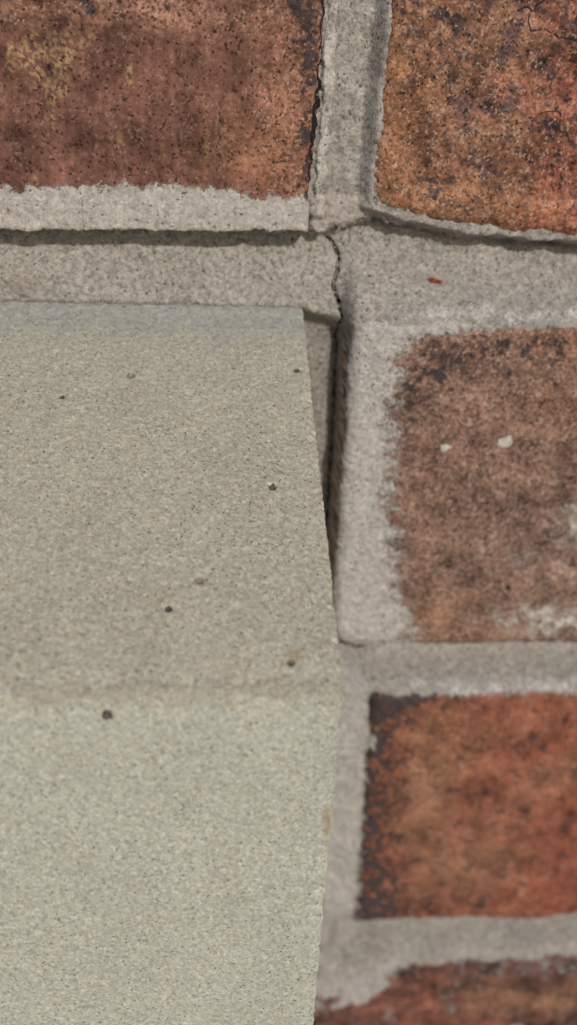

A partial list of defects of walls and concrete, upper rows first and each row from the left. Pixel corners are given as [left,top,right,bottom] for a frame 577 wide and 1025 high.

crack [323,233,343,524]
crack [338,639,367,648]